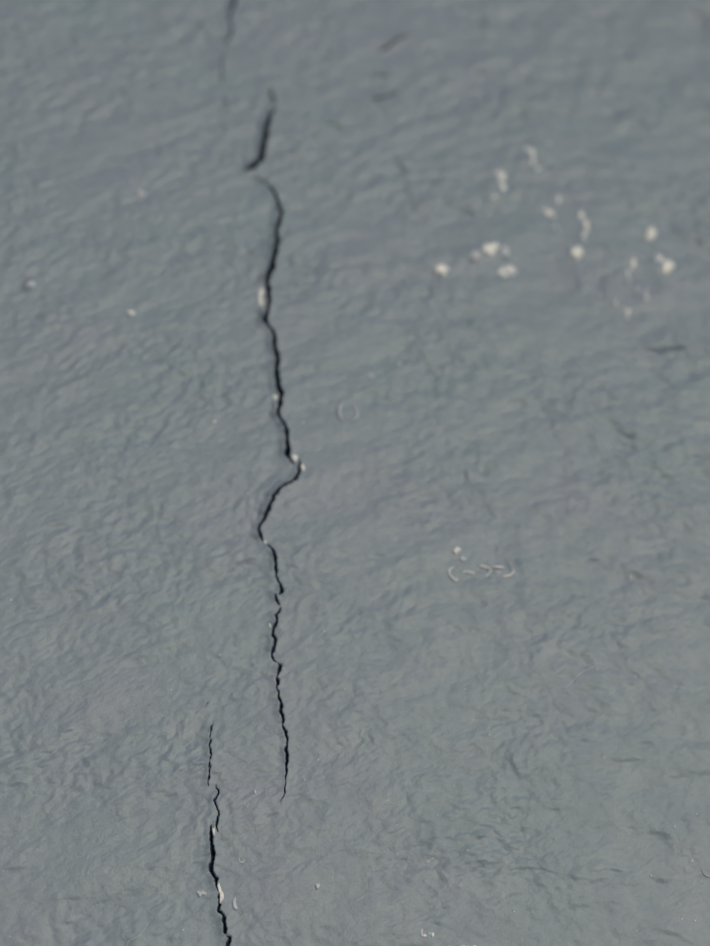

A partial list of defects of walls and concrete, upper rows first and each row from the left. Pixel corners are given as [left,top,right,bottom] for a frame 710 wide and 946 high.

crack [245,88,305,794]
crack [208,725,231,946]